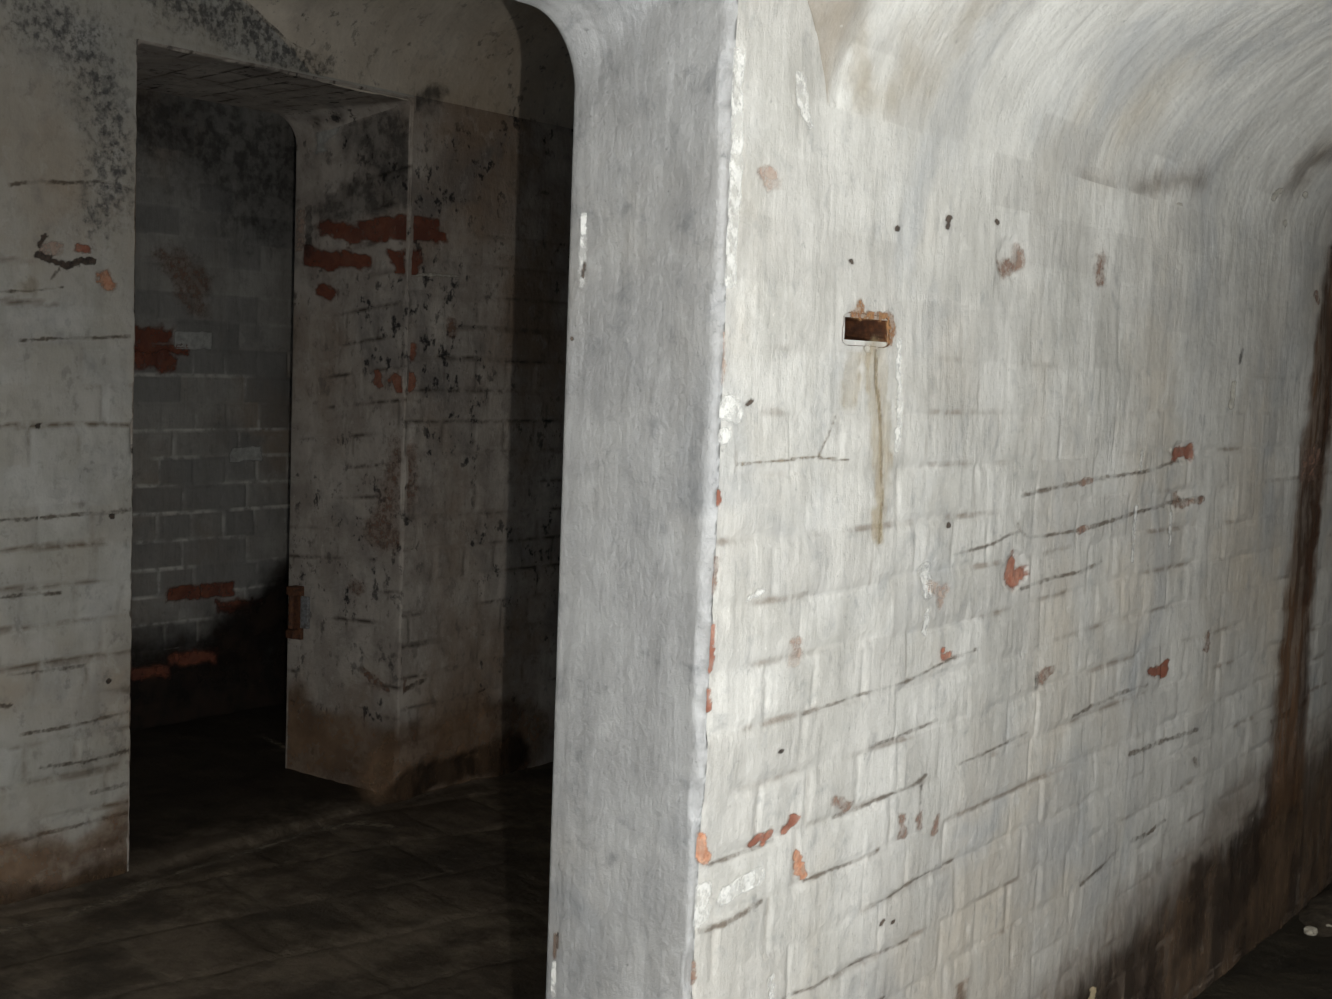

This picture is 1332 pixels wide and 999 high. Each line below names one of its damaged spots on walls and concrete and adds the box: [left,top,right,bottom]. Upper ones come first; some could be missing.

mould [154,0,327,74]
leakage [15,1,126,222]
flaking render [296,210,447,301]
flaking render [134,325,212,373]
flaking render [1171,443,1193,462]
flaking render [1004,550,1029,589]
rust [1240,246,1332,958]
leakage [130,563,547,803]
flaking render [748,813,801,848]
flaking render [793,849,808,880]
leakage [1076,818,1264,999]
leakage [1283,746,1332,925]